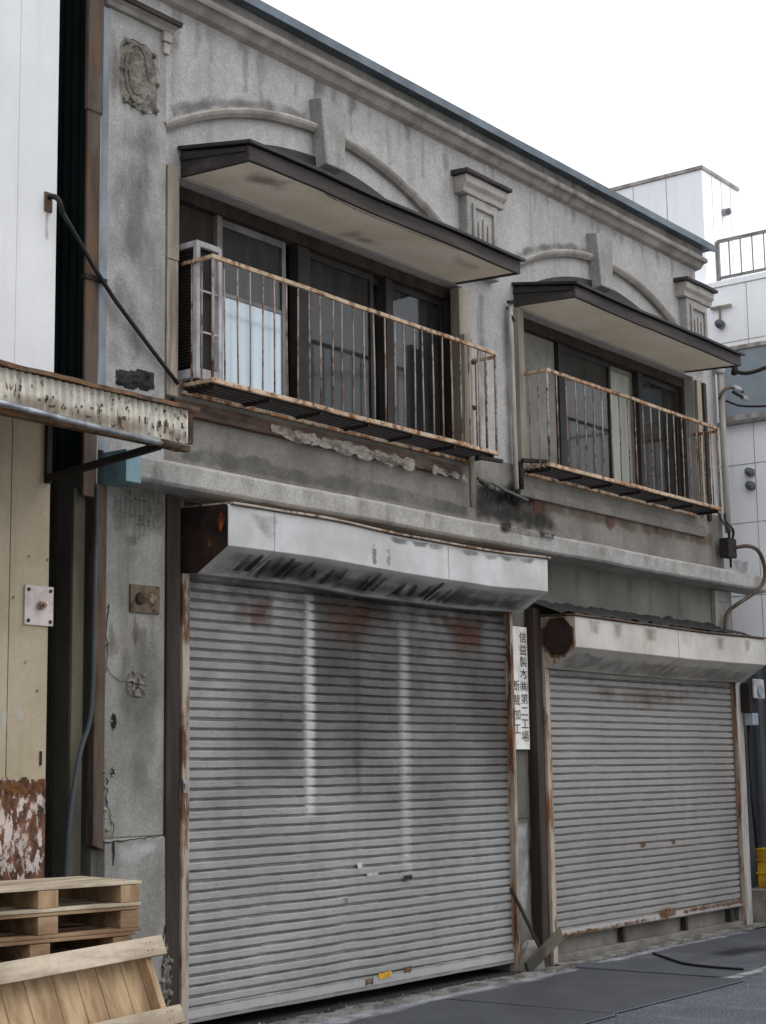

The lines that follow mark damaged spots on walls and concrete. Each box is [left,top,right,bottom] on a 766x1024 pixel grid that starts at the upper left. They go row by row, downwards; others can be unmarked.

peeling [271,424,416,471]
damp [477,487,553,529]
corrosion [660,899,742,918]